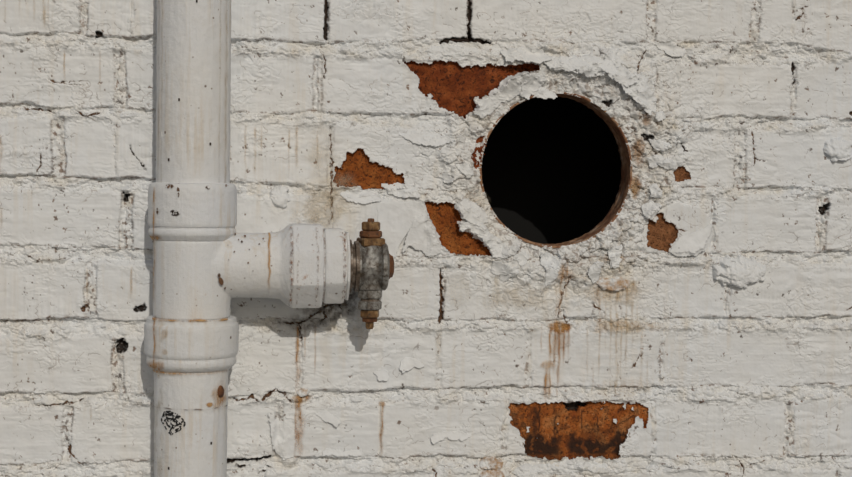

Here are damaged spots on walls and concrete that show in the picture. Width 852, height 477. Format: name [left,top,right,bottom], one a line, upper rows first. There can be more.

spalling [333,46,666,287]
peeling [641,134,691,182]
peeling [641,183,713,257]
crack [285,299,345,341]
corrosion [549,321,570,355]
crack [233,389,292,402]
flaking render [508,401,649,460]